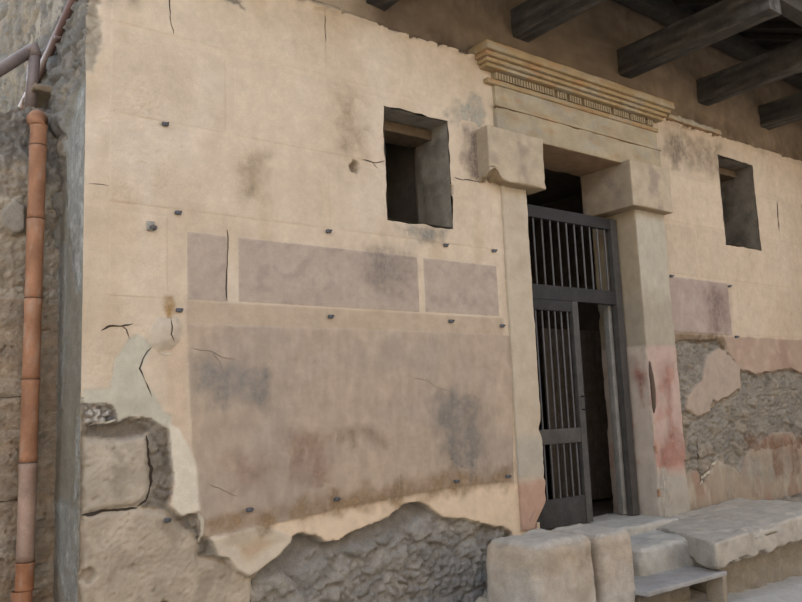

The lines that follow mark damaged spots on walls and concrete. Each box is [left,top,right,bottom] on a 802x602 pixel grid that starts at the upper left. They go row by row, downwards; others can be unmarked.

crack [101,323,133,339]
crack [139,348,152,396]
spalling [675,338,802,486]
spalling [78,397,231,560]
spalling [251,501,513,602]